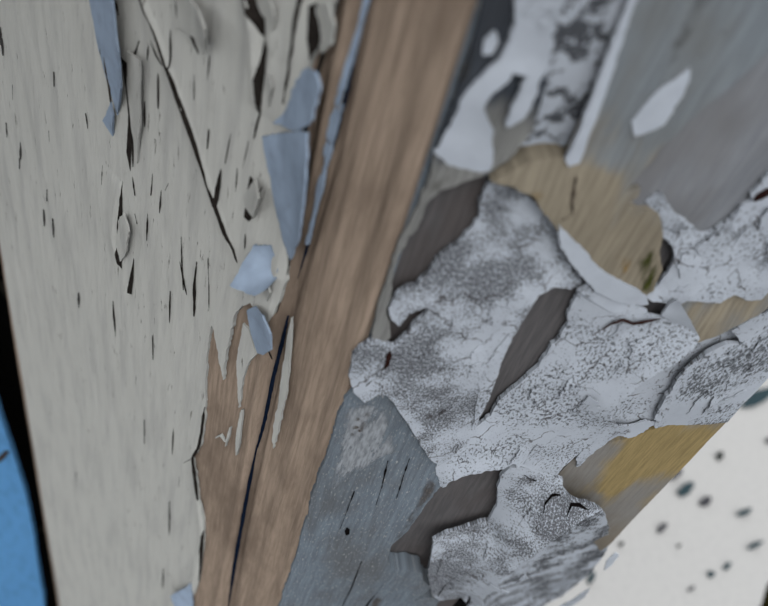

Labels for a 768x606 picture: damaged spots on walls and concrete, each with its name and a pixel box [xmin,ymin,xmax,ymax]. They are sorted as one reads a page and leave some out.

crack [104,0,237,295]
peeling [336,0,768,606]
peeling [171,583,194,606]